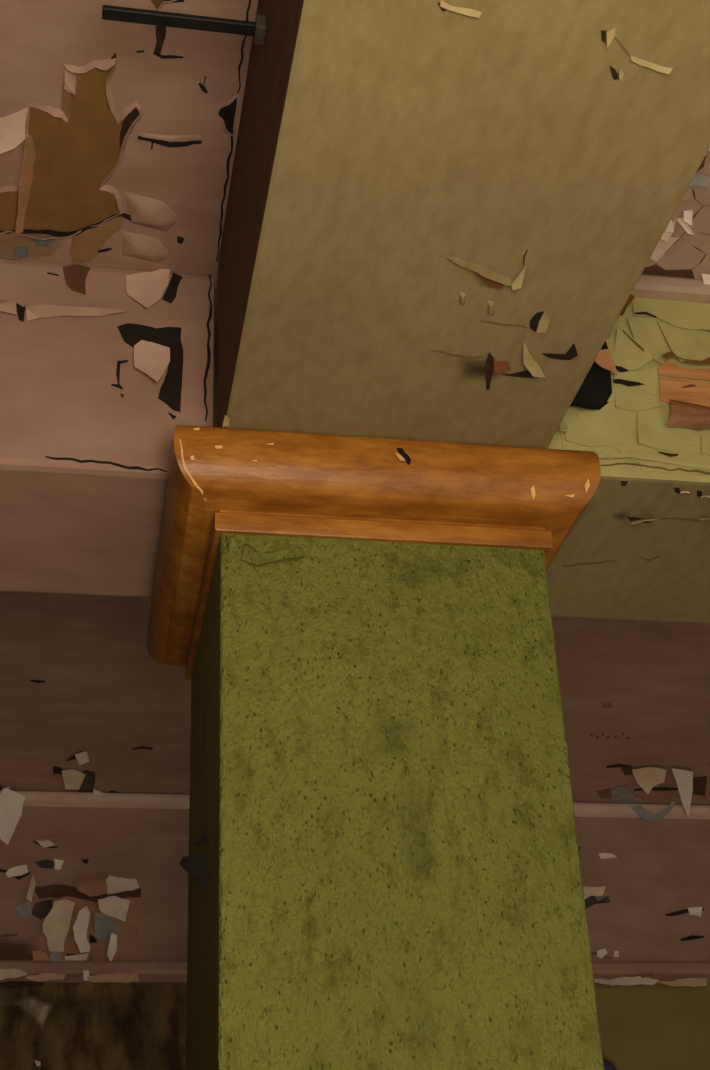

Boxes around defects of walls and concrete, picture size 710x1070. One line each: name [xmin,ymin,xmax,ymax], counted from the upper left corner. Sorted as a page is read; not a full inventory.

crack [601,27,673,81]
peeling [0,52,183,419]
flaking render [661,210,693,241]
peeling [530,311,550,333]
crack [547,150,710,480]
peeling [431,342,578,390]
peeling [559,294,710,475]
crack [45,456,167,472]
peeling [0,785,26,845]
peeling [53,751,121,795]
peeling [596,764,707,821]
peeling [0,840,141,987]